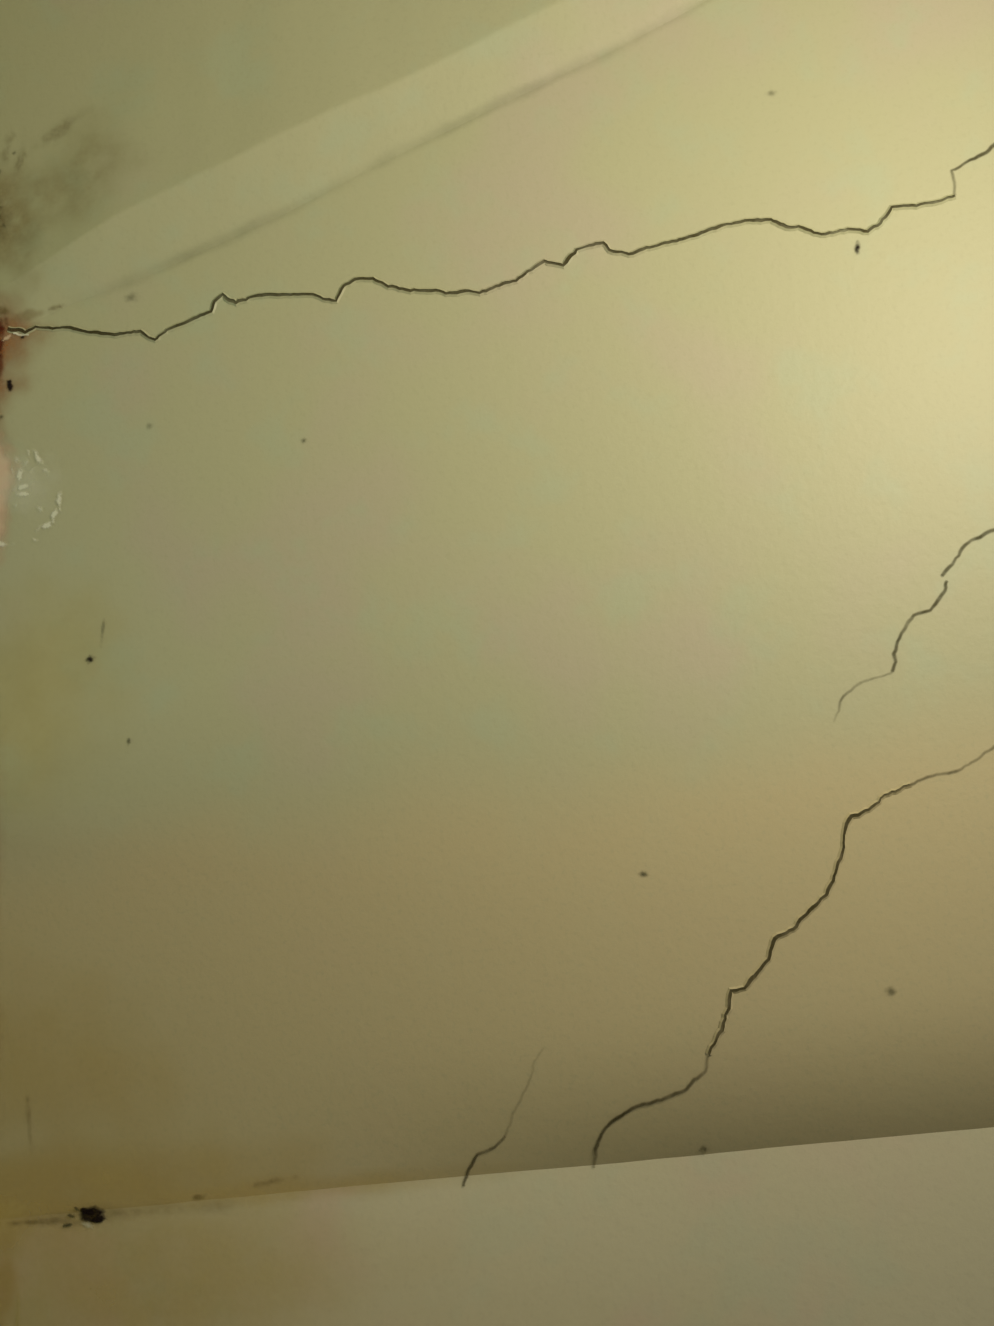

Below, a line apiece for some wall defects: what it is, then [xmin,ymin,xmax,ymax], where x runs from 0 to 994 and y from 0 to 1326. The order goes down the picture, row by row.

crack [7,144,994,343]
corrosion [0,310,24,391]
crack [892,529,994,672]
crack [594,781,913,1156]